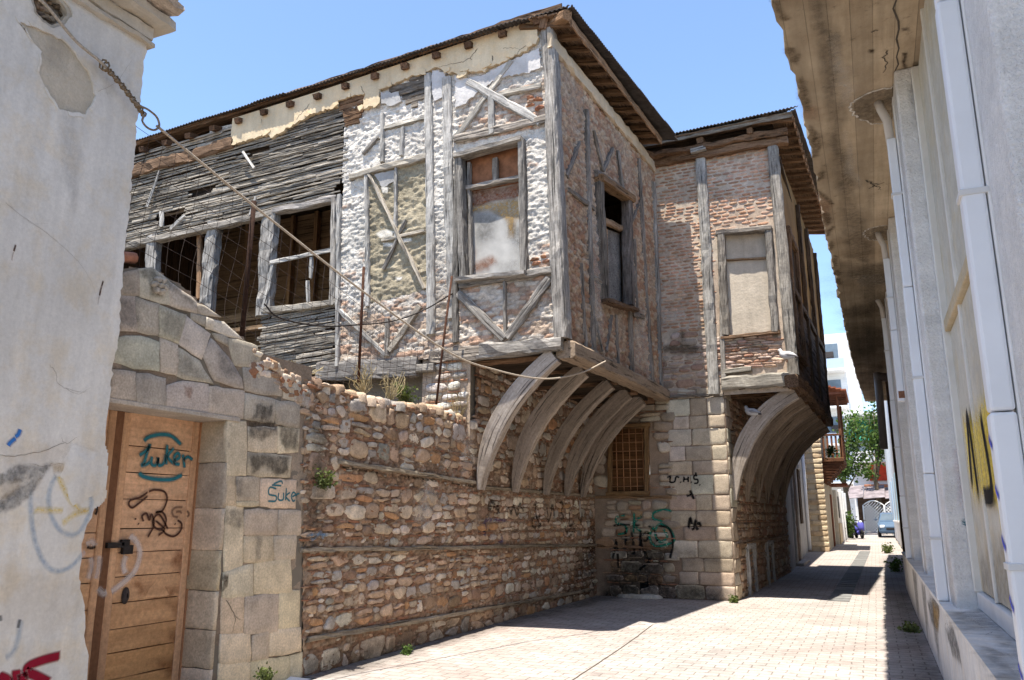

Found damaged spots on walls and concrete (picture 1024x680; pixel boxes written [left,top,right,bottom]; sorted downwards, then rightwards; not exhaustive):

spalling [15,0,99,118]
crack [871,0,900,92]
flaking render [329,81,392,111]
spalling [526,95,544,111]
water stain [848,86,894,125]
spalling [530,254,550,267]